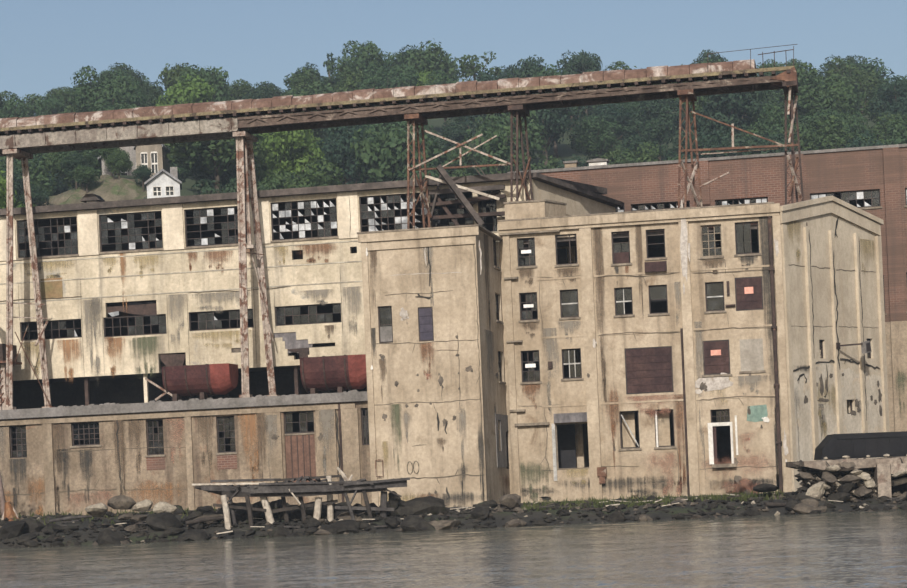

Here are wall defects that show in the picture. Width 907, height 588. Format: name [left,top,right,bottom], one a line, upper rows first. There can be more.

corrosion [58,339,78,378]
corrosion [106,337,122,356]
crack [793,358,880,372]
leakage [10,458,26,507]
leakage [45,417,69,502]
leakage [80,449,92,495]
leakage [114,419,141,475]
spalling [405,402,456,434]
leakage [602,477,673,497]
peeling [783,361,884,488]